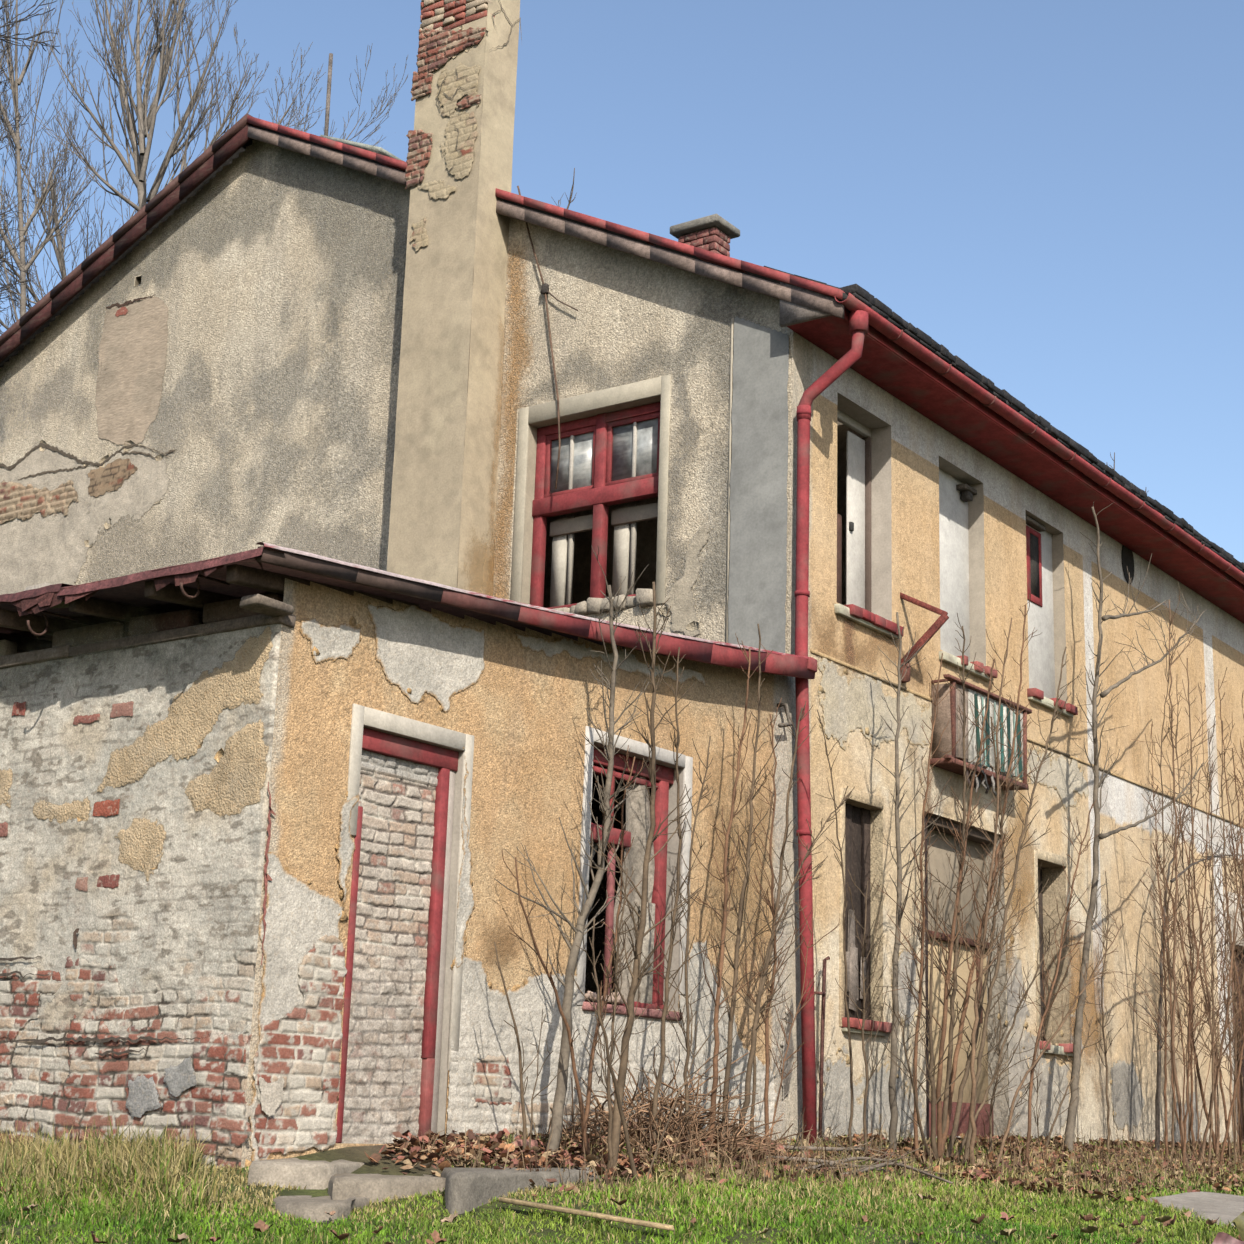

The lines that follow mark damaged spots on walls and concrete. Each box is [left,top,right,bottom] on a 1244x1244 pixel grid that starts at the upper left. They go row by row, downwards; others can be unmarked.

spalling [405,0,495,189]
water stain [90,149,407,365]
spalling [0,440,170,595]
crack [0,443,177,480]
water stain [88,515,199,581]
water stain [241,356,384,538]
water stain [280,516,379,569]
peeling [33,626,273,824]
peeling [299,602,485,712]
peeling [818,657,932,750]
spalling [0,791,359,1167]
peeling [446,748,795,1154]